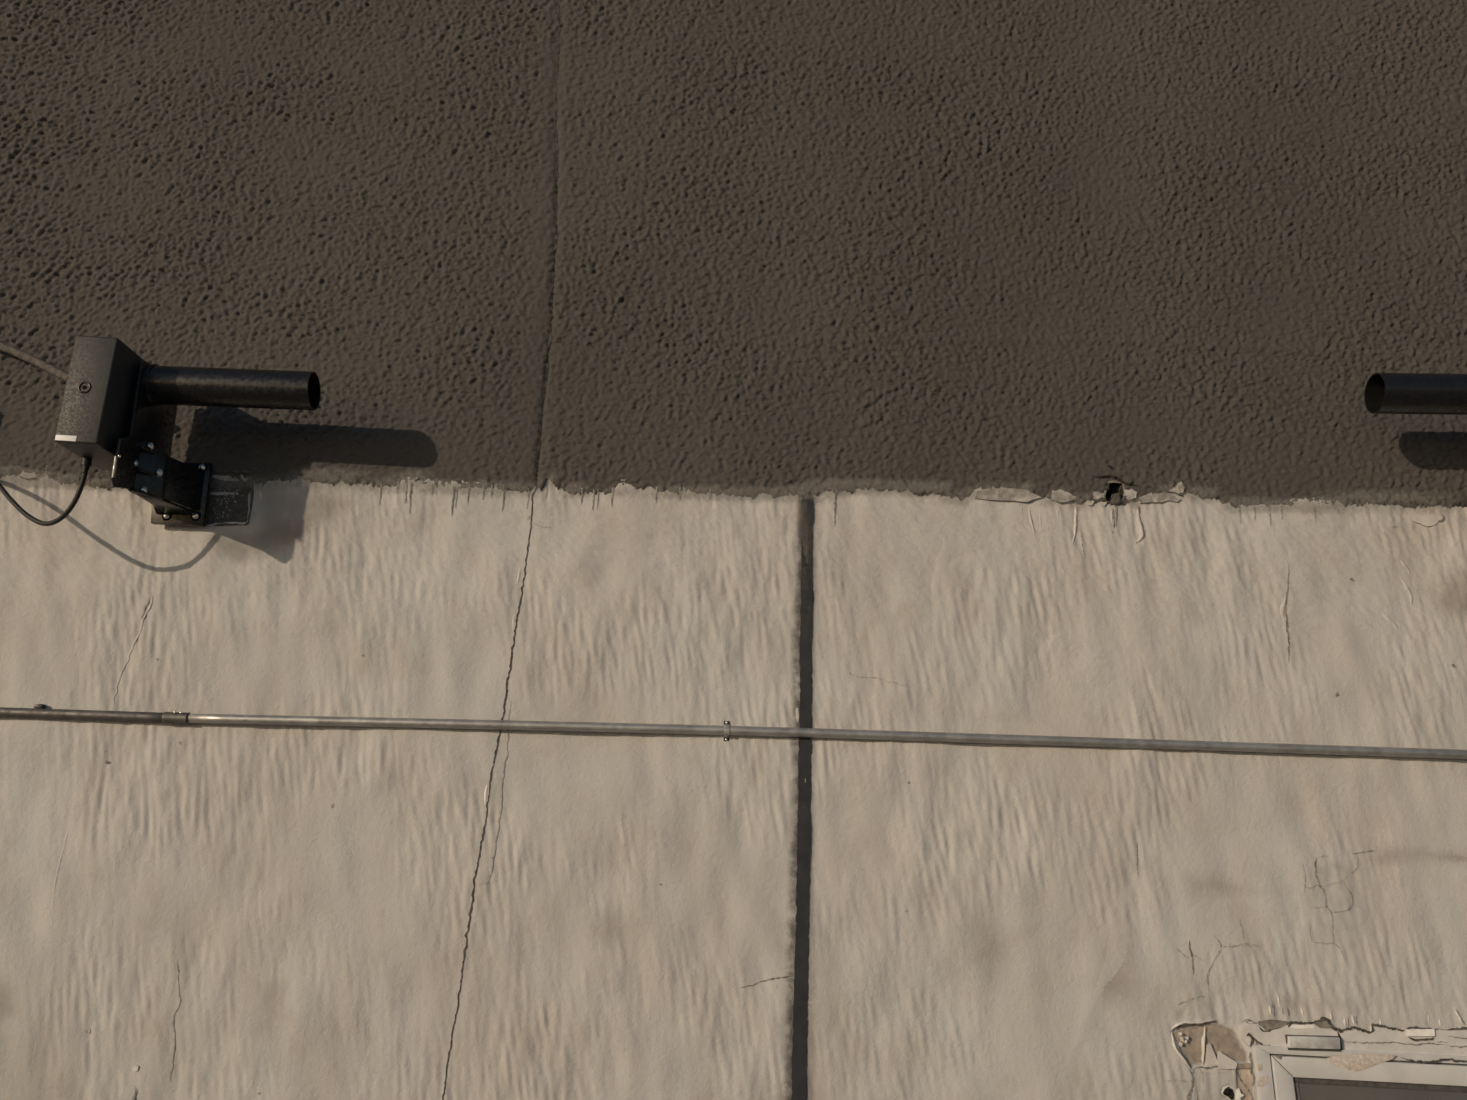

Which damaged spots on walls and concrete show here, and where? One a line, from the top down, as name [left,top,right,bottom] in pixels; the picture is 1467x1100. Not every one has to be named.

crack [442,1,562,1100]
spalling [1171,1019,1262,1100]